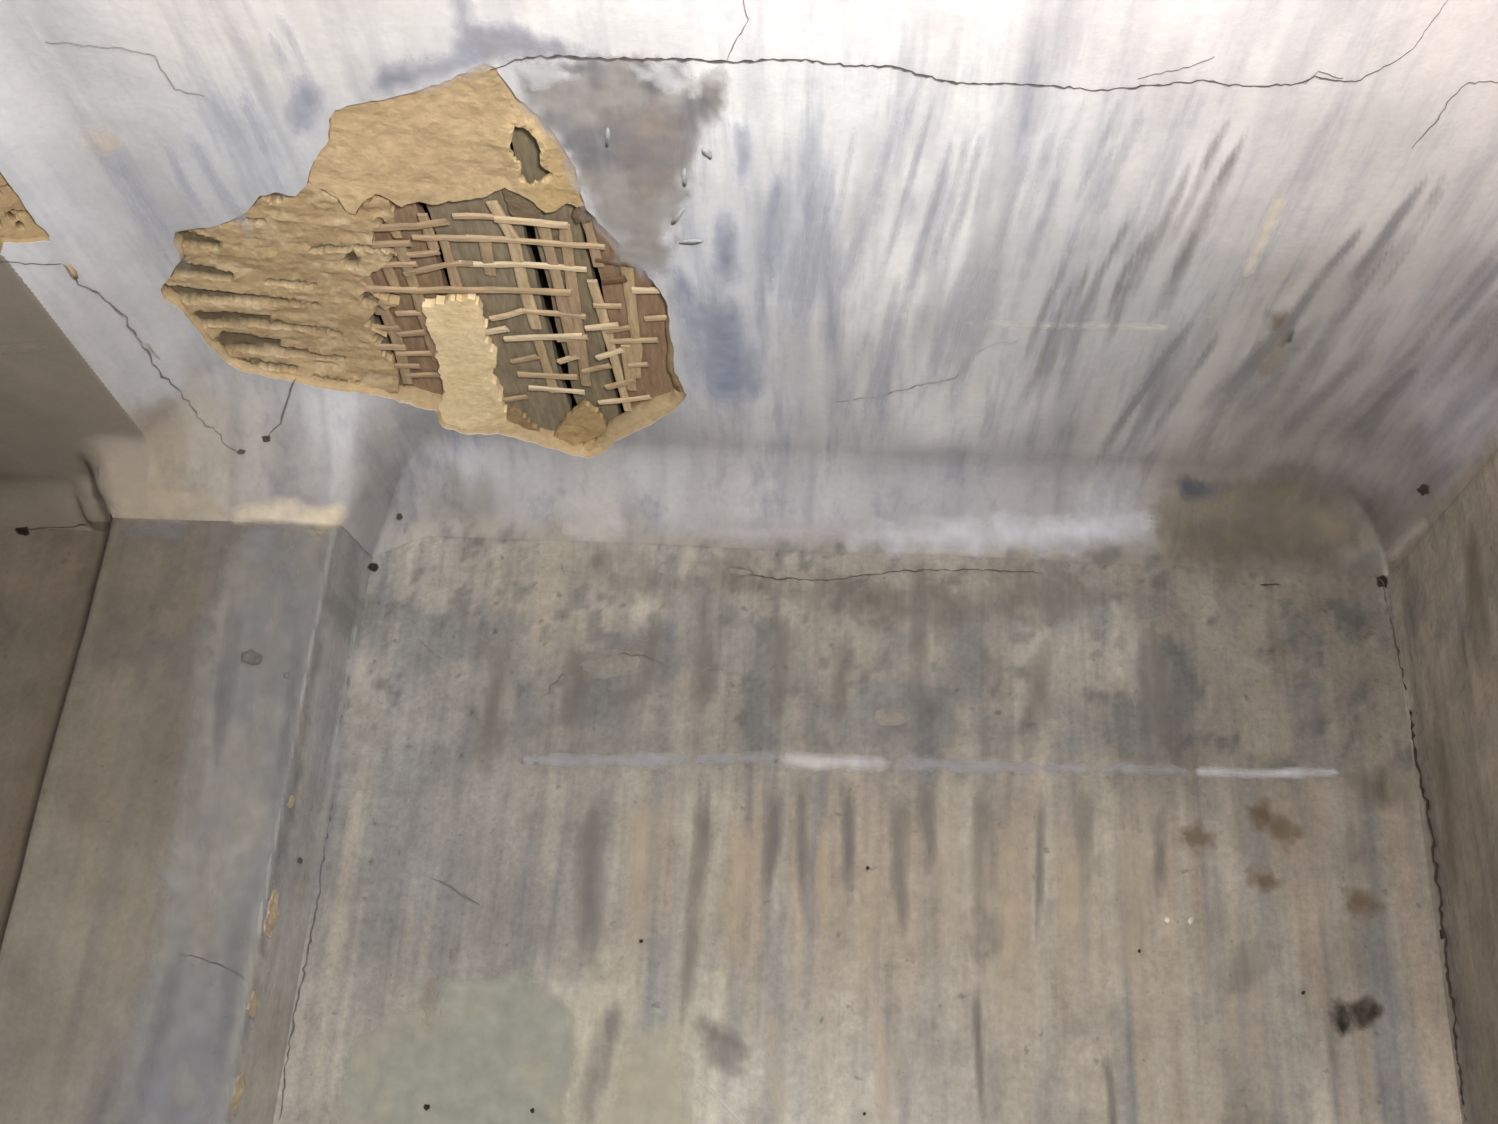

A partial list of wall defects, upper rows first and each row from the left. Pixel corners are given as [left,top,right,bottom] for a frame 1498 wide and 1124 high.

crack [491,0,1448,91]
crack [1412,81,1498,148]
flaking render [0,172,50,253]
crack [0,261,296,452]
flaking render [161,54,726,459]
damp [675,277,760,398]
damp [869,148,981,402]
damp [1169,140,1237,290]
damp [1220,195,1415,406]
damp [729,786,854,932]
crack [1373,572,1466,1121]
damp [1333,997,1383,1035]